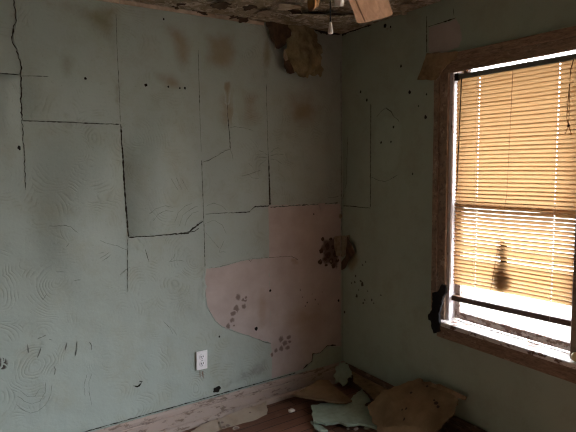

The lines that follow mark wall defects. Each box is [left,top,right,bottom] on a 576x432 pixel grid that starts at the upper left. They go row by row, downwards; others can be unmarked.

peeling [229,5,257,23]
peeling [276,3,357,29]
crack [0,0,271,288]
peeling [204,202,342,378]
leakage [216,282,346,393]